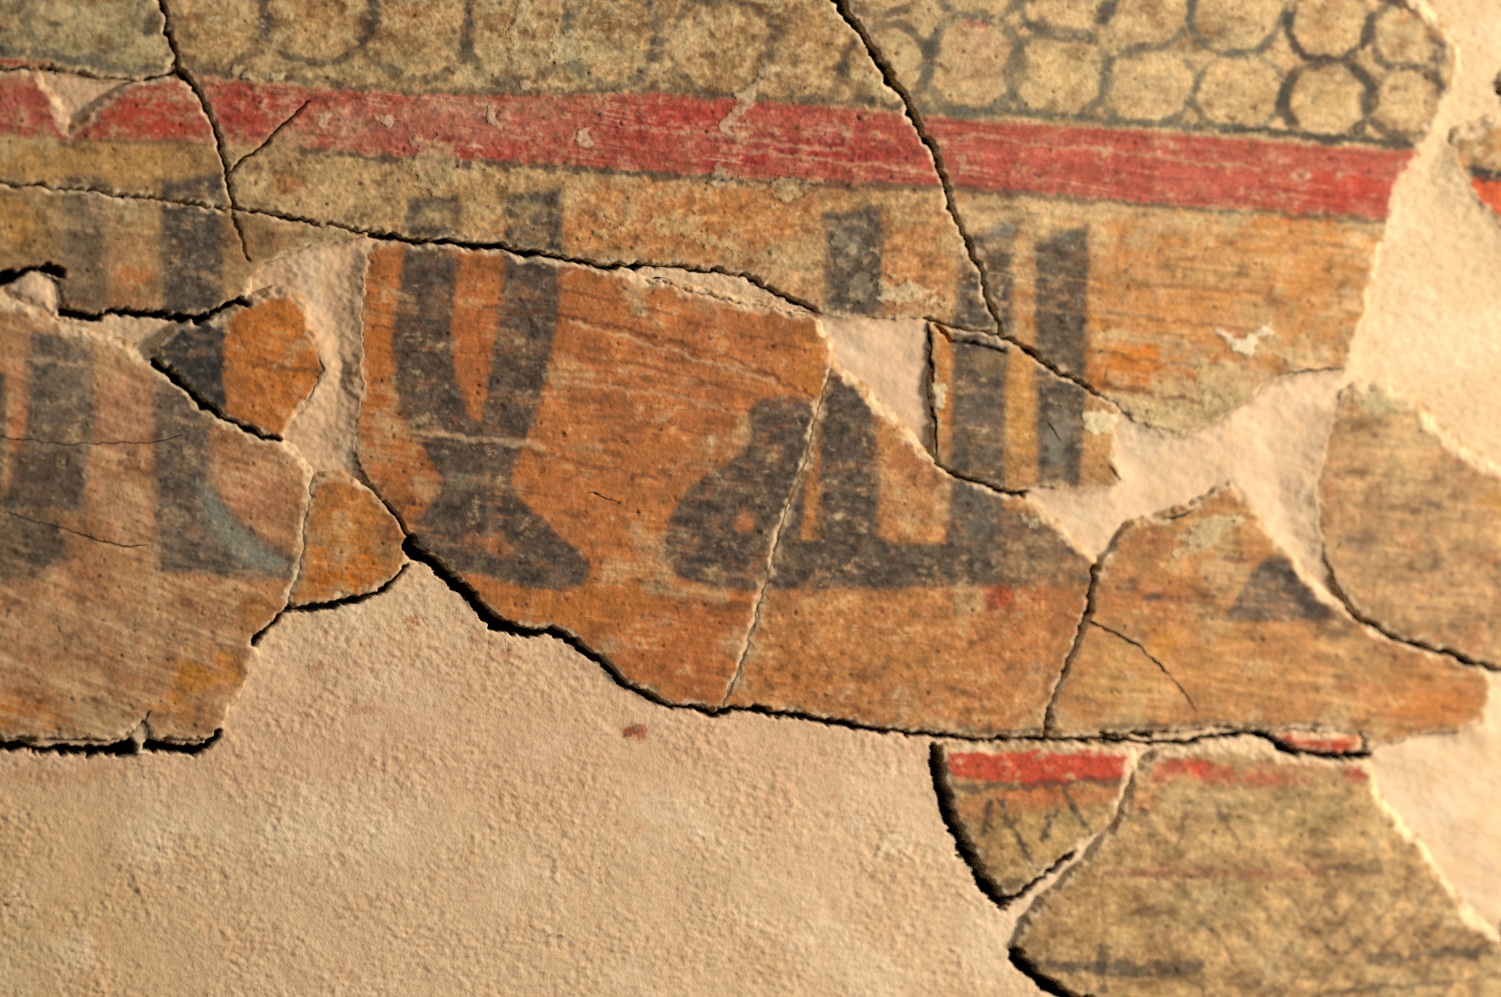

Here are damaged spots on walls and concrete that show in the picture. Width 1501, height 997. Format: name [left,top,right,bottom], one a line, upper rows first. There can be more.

crack [0,359,277,446]
spalling [251,232,385,483]
crack [0,0,813,322]
spalling [810,225,951,447]
crack [830,0,1093,495]
crack [251,367,1360,902]
spalling [1354,670,1501,936]